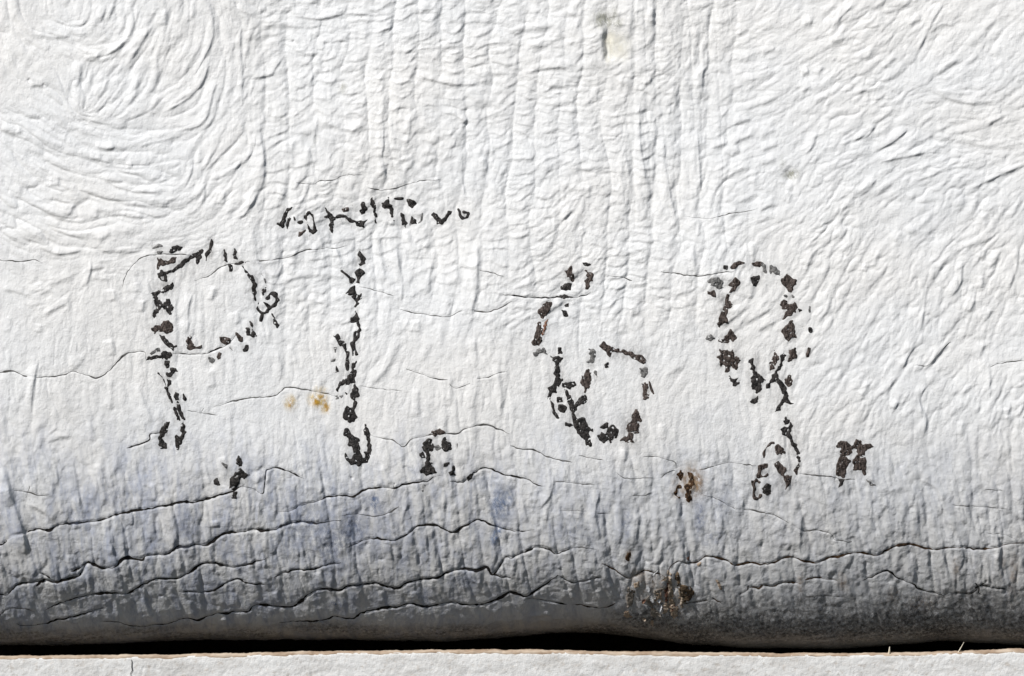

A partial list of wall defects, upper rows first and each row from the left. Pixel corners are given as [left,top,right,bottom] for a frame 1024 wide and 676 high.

crack [0,423,1024,627]
corrosion [674,469,701,503]